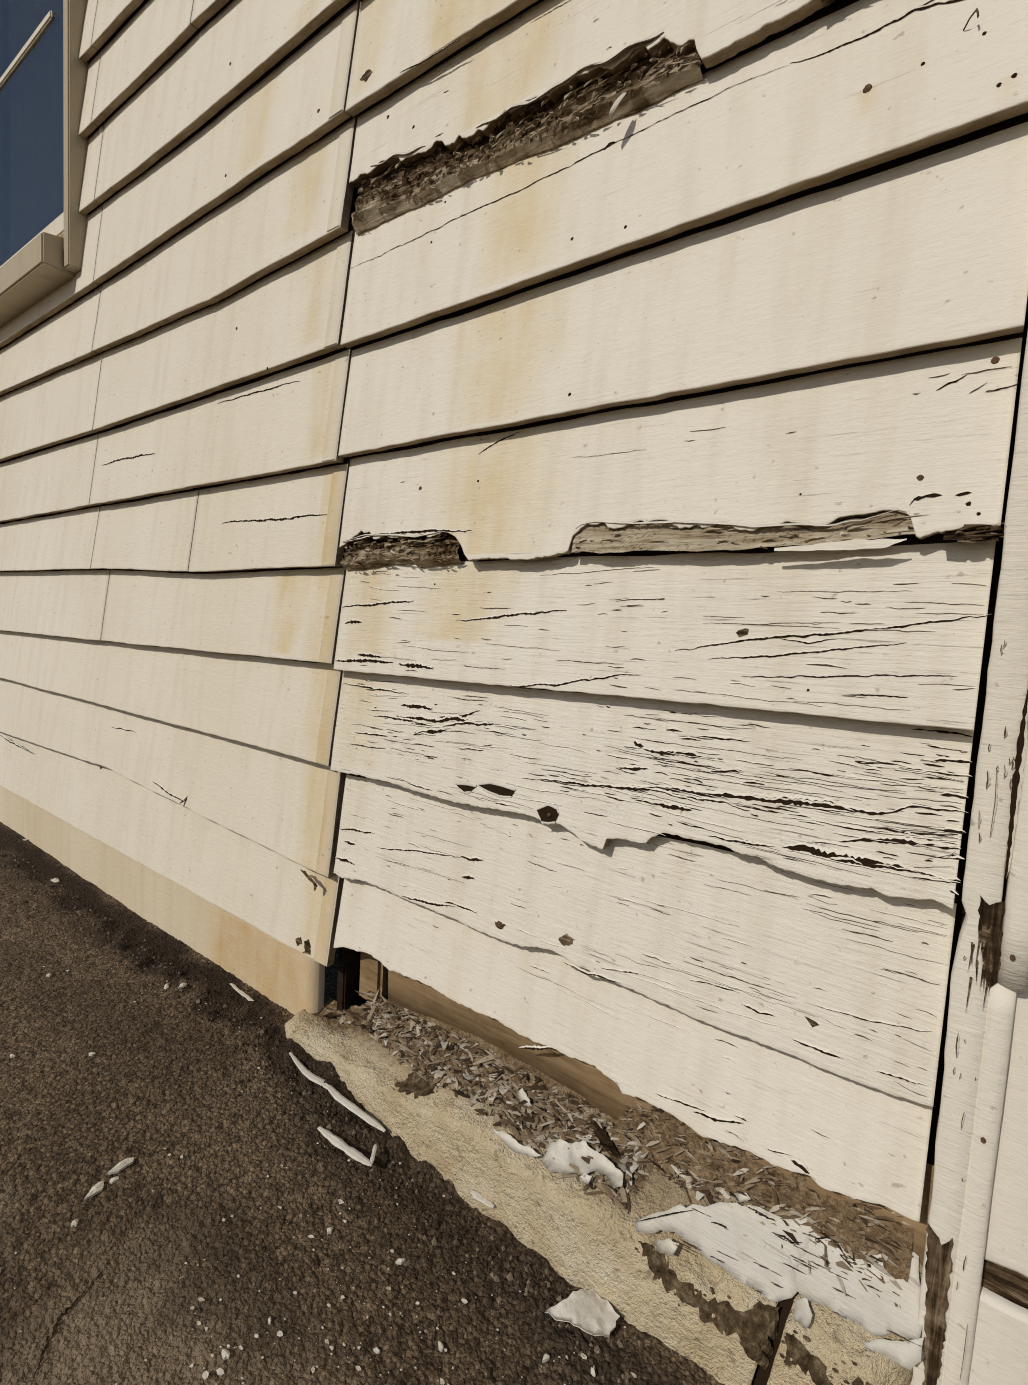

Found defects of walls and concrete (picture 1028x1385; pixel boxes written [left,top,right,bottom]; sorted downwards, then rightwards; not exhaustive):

crack [349,0,961,269]
peeling [575,509,907,551]
crack [336,600,496,737]
crack [544,614,992,895]
crack [1005,690,1028,878]
crack [335,827,484,913]
spalling [495,922,575,949]
spalling [393,1065,438,1099]
peeling [492,1129,542,1157]
peeling [545,1289,620,1338]
crack [753,1296,794,1385]
peeling [634,1193,924,1385]